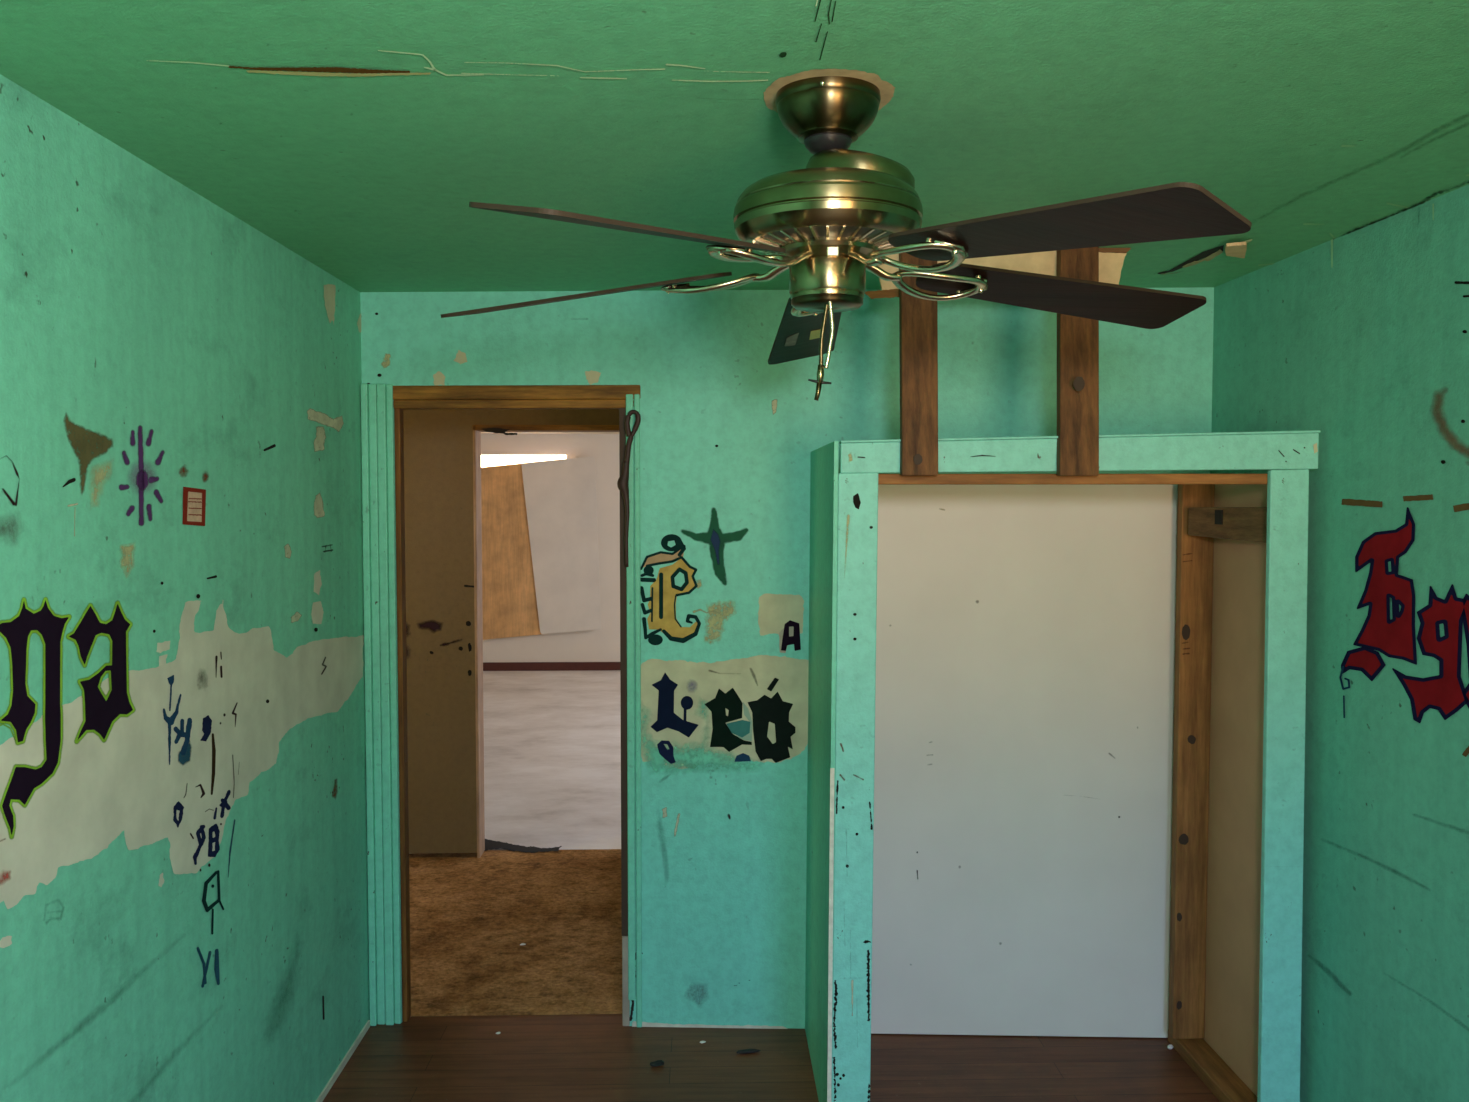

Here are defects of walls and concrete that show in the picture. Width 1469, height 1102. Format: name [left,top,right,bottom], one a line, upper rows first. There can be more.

crack [147,50,770,82]
peeling [324,284,336,323]
peeling [693,602,733,640]
peeling [758,593,804,636]
peeling [641,655,809,771]
peeling [0,570,364,909]
peeling [0,936,12,948]